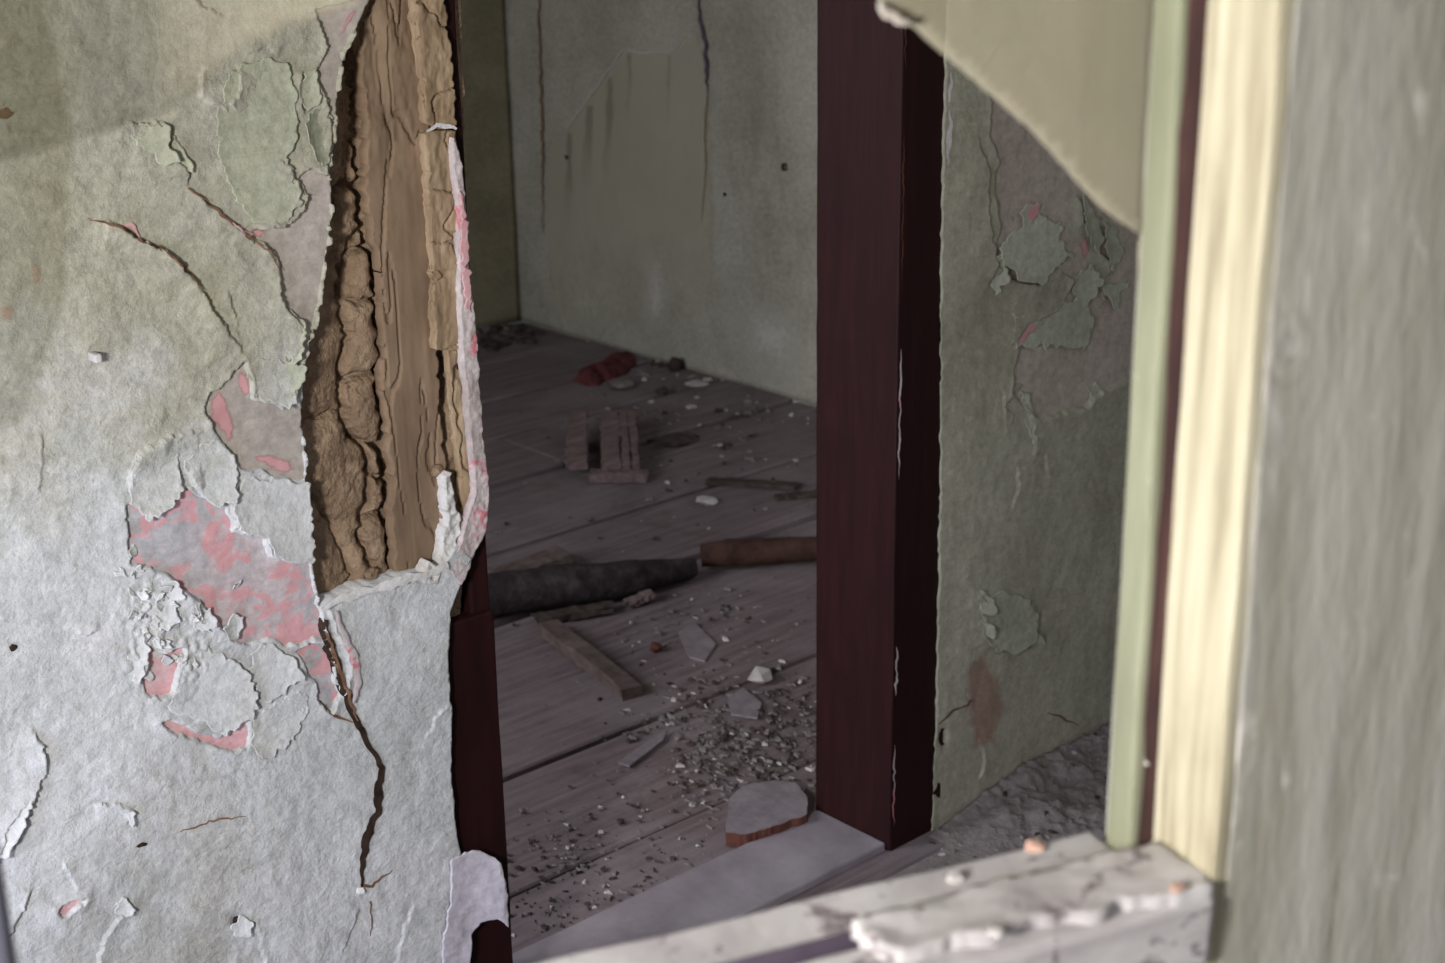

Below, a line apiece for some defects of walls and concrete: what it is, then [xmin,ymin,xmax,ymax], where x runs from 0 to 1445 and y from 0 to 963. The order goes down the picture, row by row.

flaking render [113,0,489,760]
crack [536,0,544,231]
crack [697,0,709,221]
peeling [990,95,1140,445]
crack [318,617,393,936]